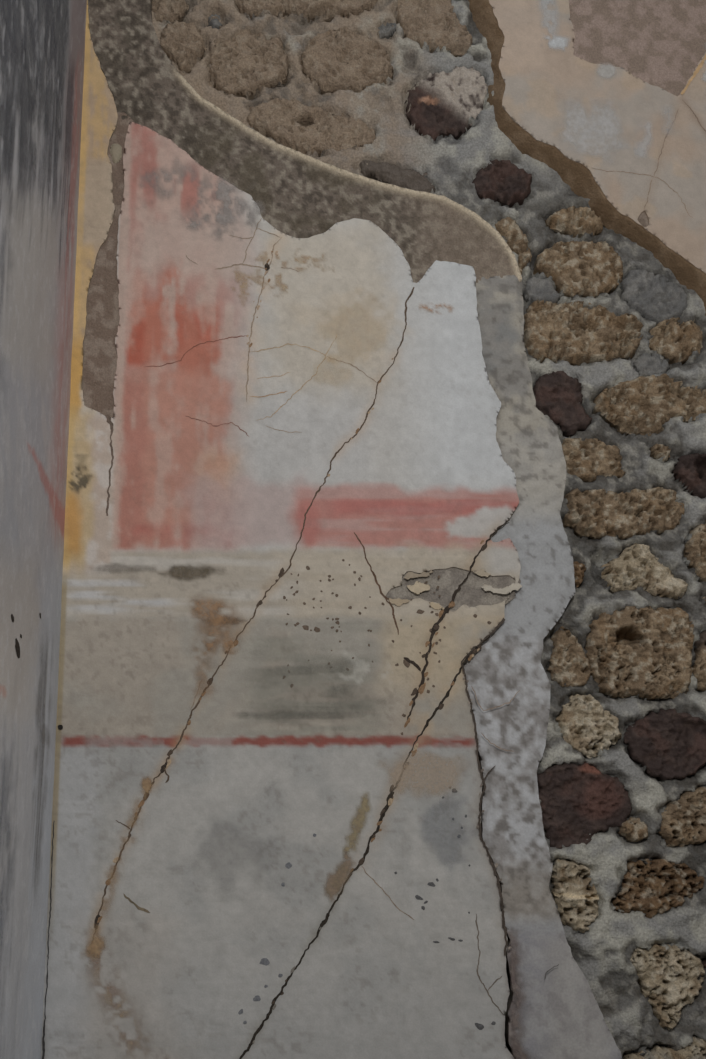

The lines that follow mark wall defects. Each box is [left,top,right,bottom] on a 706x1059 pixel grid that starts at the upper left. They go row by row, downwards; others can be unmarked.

flaking render [82,112,135,418]
crack [92,220,415,941]
crack [239,520,520,1059]
spalling [152,0,706,1059]
crack [593,103,706,218]